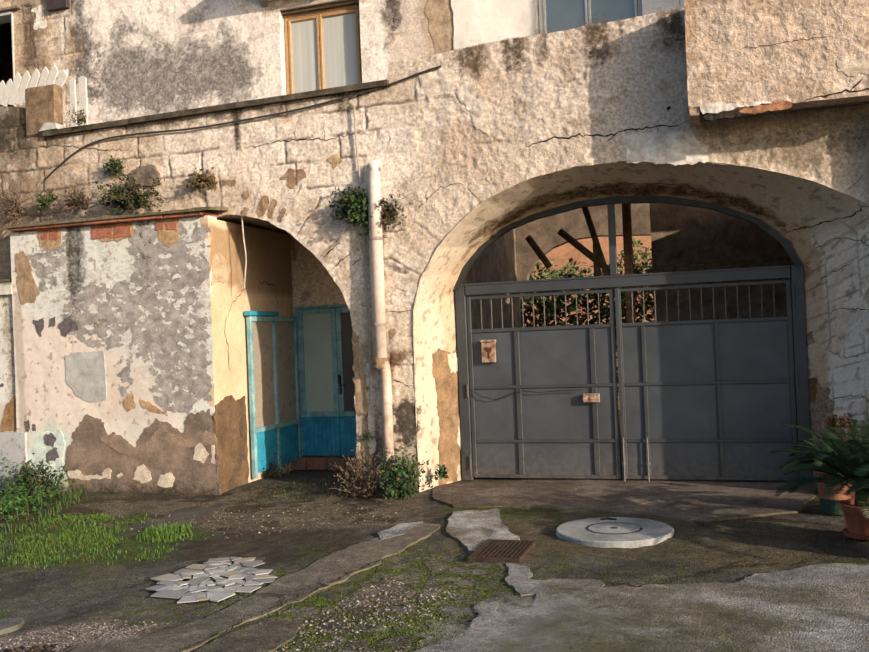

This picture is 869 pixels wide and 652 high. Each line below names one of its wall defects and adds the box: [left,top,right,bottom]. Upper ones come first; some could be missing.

water stain [382,0,401,29]
water stain [583,22,609,57]
crack [741,36,830,49]
water stain [70,0,255,149]
water stain [275,91,359,112]
crack [805,79,869,101]
crack [527,120,688,147]
spalling [279,168,306,189]
spalling [241,190,286,222]
crack [789,206,869,251]
peeling [0,218,249,495]
flaking render [432,348,461,485]